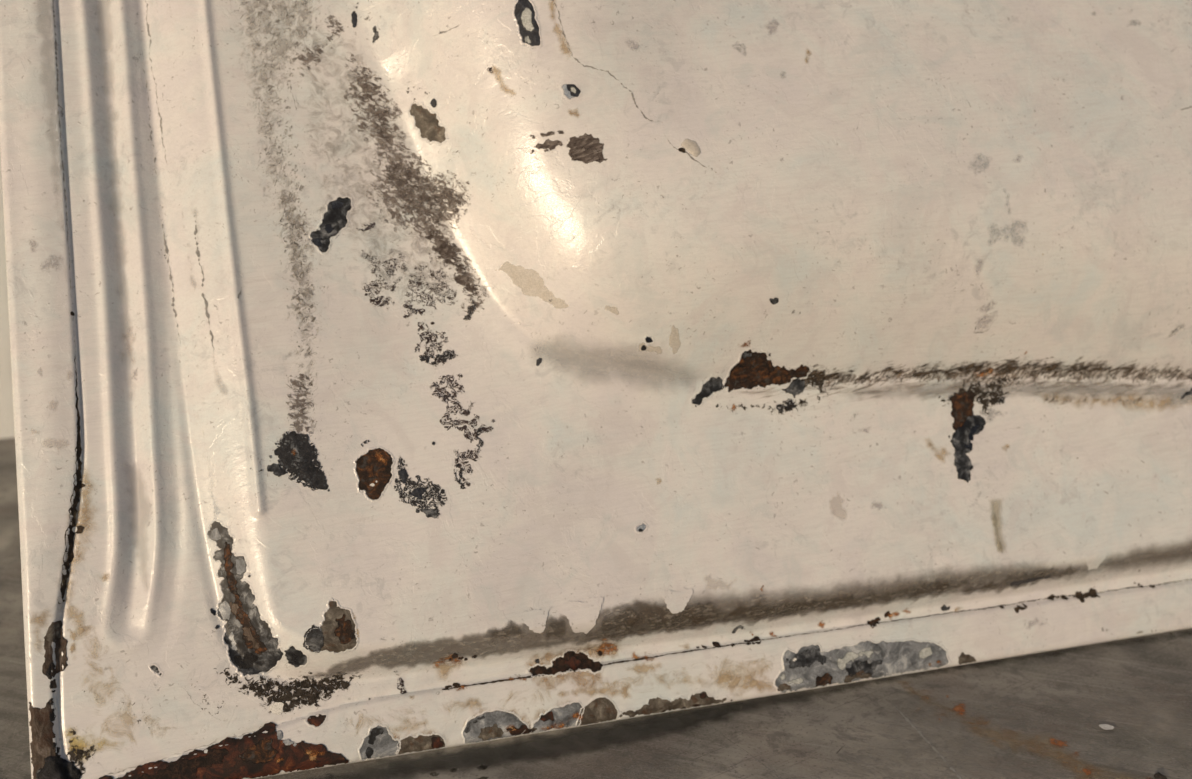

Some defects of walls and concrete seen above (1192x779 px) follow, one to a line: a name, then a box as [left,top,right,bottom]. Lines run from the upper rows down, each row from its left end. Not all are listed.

peeling [512,0,543,49]
peeling [406,87,459,161]
peeling [308,195,355,256]
peeling [250,374,330,491]
rust [930,369,1015,483]
crack [57,359,85,604]
peeling [205,518,360,678]
rust [29,610,85,779]
rust [99,722,349,779]
peeling [357,723,448,761]
peeling [461,648,620,745]
peeling [773,638,978,694]